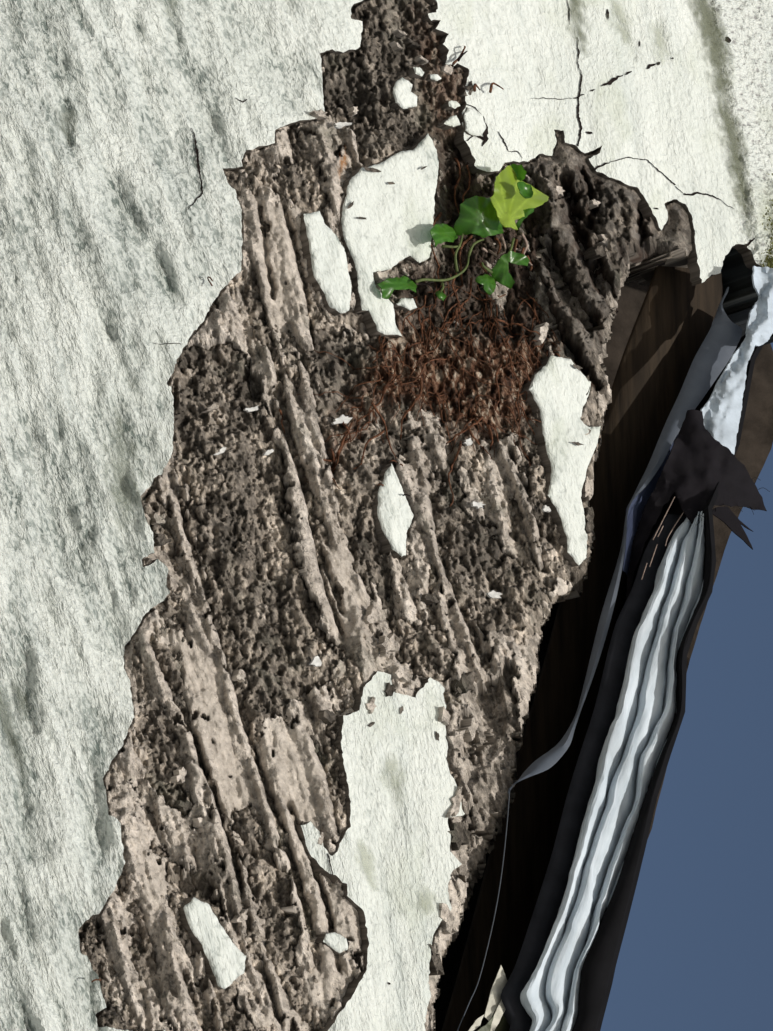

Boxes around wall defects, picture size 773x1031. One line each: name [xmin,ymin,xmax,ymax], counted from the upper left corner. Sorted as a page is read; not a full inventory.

crack [188,128,203,209]
damp [572,0,585,51]
crack [531,1,674,146]
crack [594,157,734,209]
damp [695,0,752,212]
flaking render [78,0,693,1031]